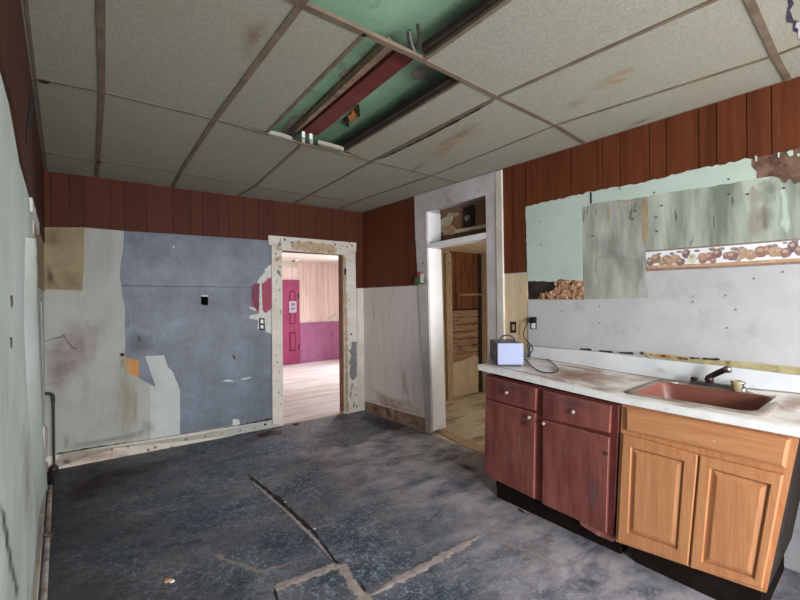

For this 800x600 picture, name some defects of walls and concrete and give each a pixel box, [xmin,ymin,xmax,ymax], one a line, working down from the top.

peeling [410,64,436,81]
spalling [268,70,369,152]
spalling [751,148,800,184]
spalling [528,279,585,300]
crack [247,474,339,564]